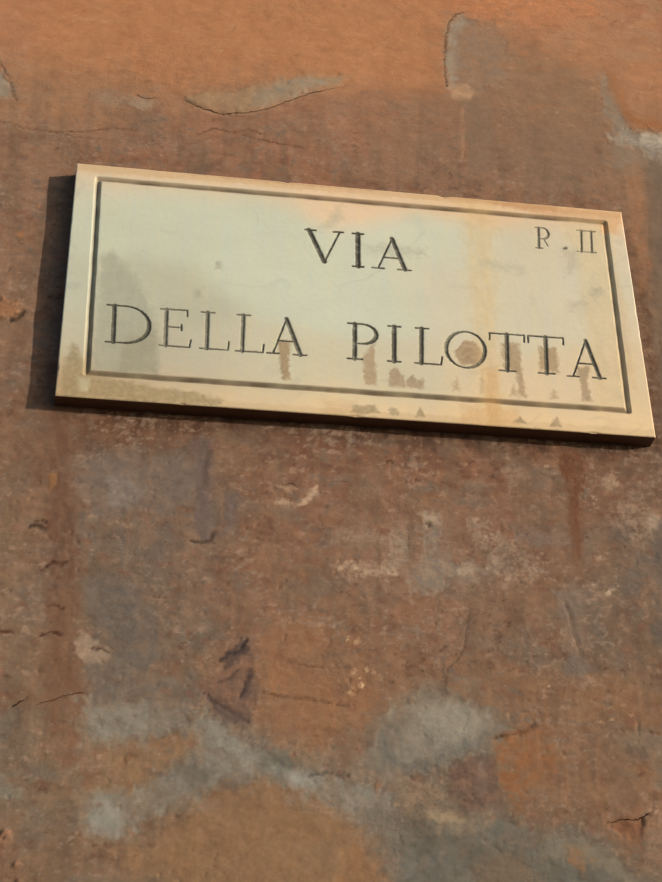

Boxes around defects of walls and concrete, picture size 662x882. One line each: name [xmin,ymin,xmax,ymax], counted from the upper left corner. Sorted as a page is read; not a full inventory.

damp [450,90,607,205]
crack [13,692,84,707]